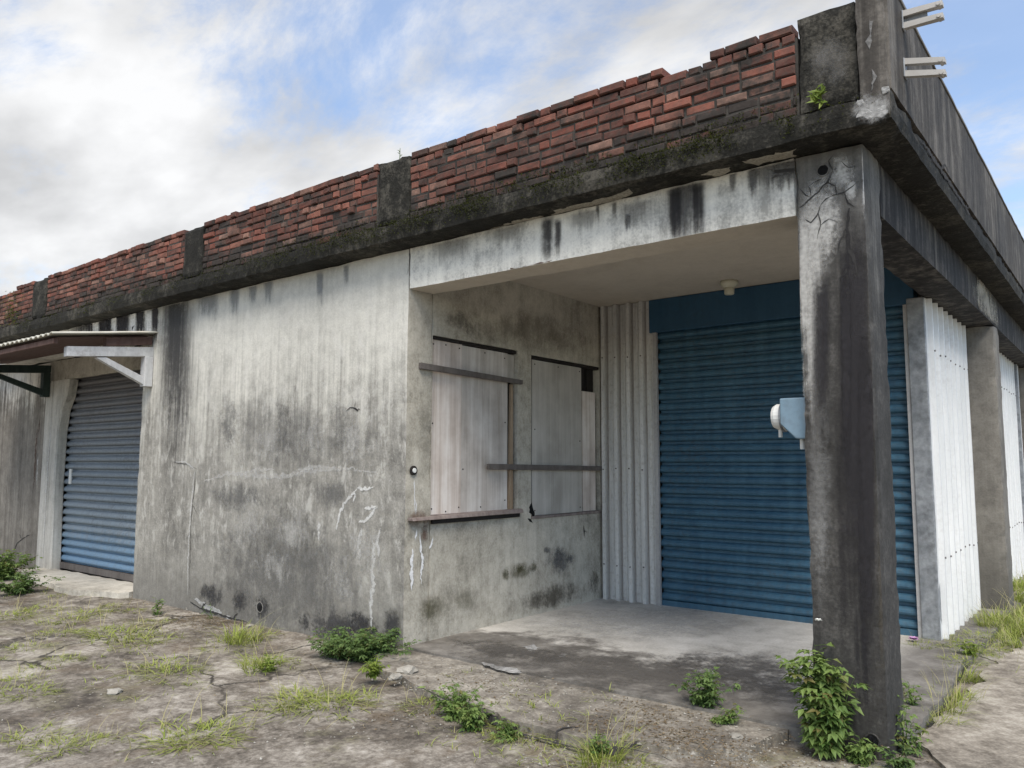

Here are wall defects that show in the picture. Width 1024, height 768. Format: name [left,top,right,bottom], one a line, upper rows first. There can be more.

spalling [856,70,890,119]
spalling [702,167,730,177]
spalling [743,149,796,165]
water stain [542,220,560,255]
water stain [669,183,702,234]
crack [772,158,857,294]
water stain [415,530,433,583]
water stain [544,548,572,571]
water stain [201,586,221,605]
water stain [303,528,381,637]
water stain [532,587,574,607]
water stain [386,613,399,631]